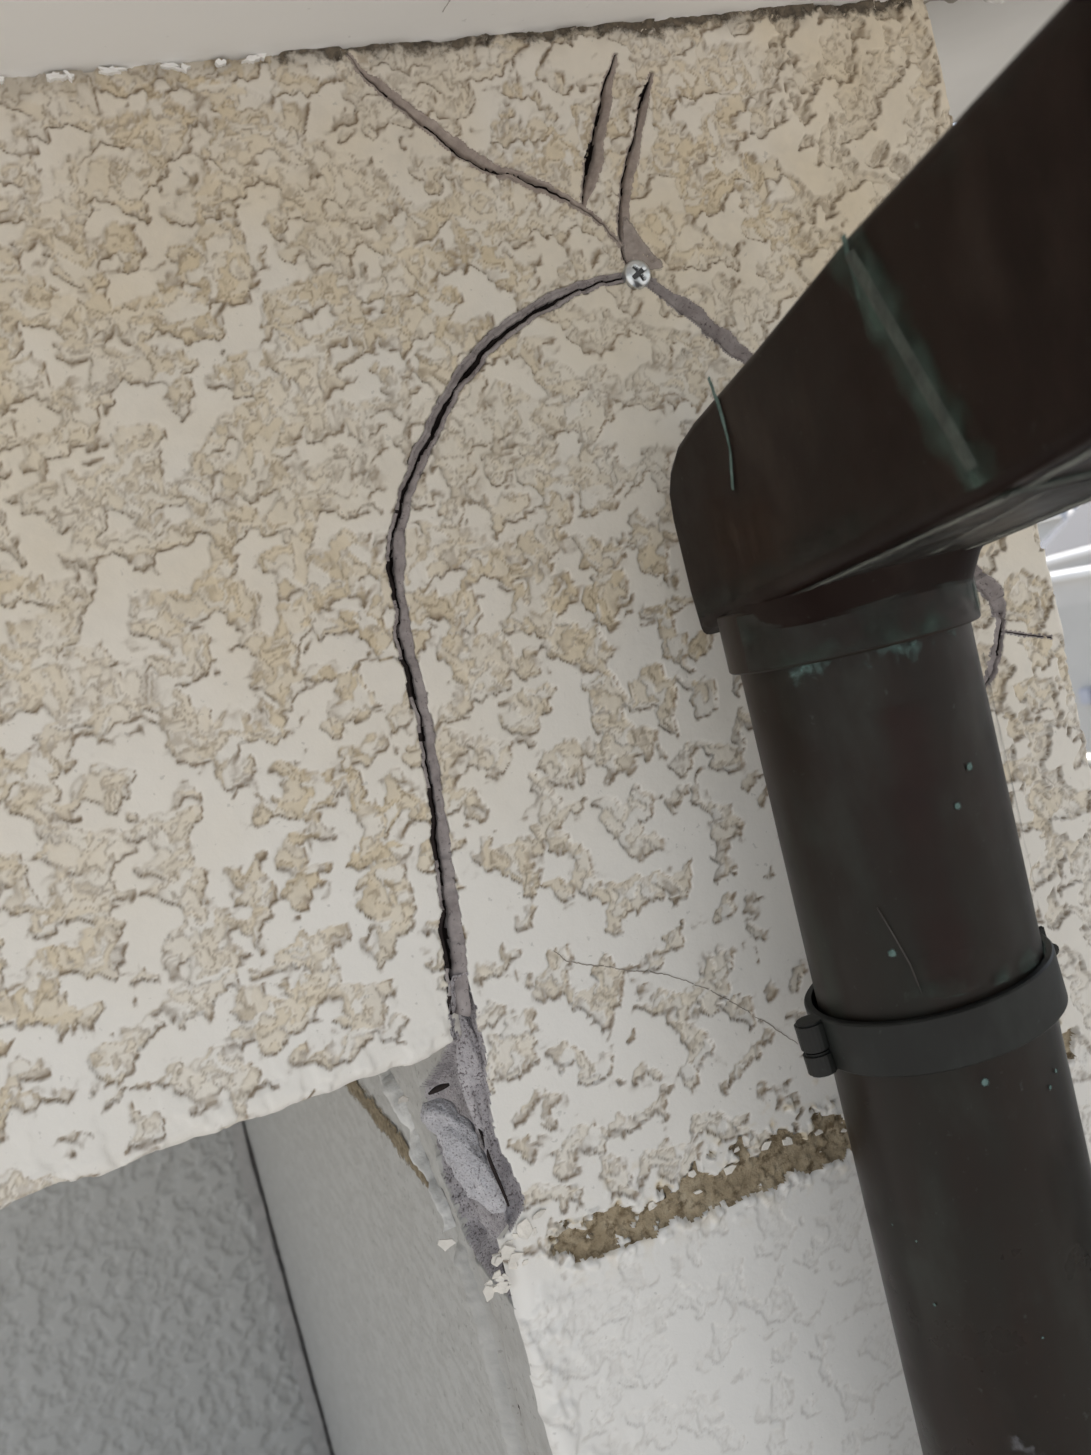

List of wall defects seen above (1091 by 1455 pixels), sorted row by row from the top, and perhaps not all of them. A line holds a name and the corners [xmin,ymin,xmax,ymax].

crack [345,52,753,1017]
crack [973,565,1053,687]
spalling [346,972,852,1302]
crack [554,951,798,1044]